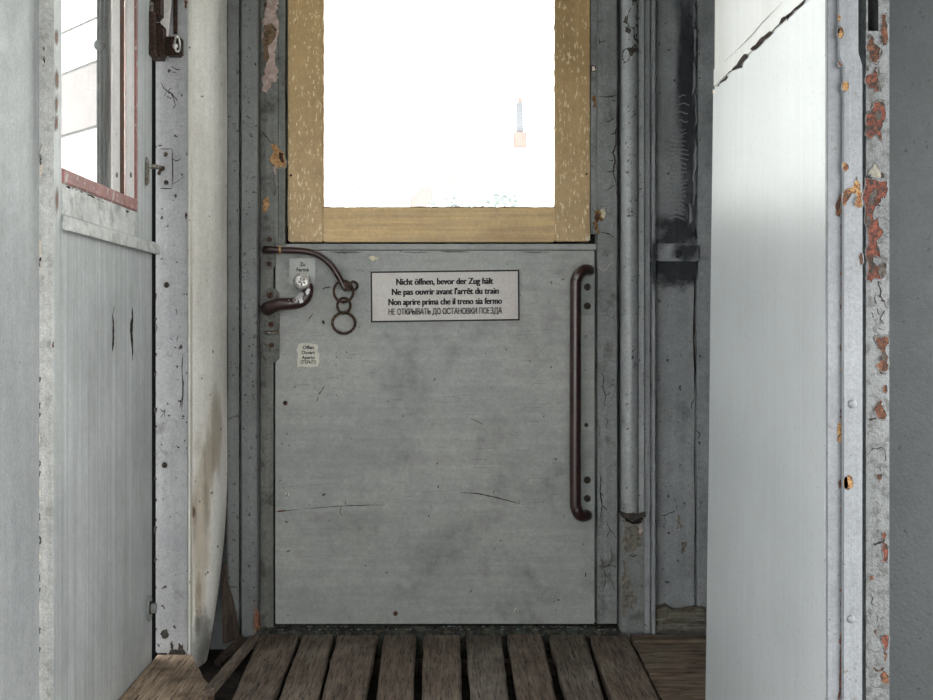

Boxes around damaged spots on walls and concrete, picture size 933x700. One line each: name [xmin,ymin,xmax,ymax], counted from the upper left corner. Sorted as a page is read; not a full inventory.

peeling [255,0,279,94]
corrosion [864,13,889,142]
peeling [269,142,287,174]
crack [598,95,637,216]
leakage [650,0,698,287]
corrosion [834,176,888,283]
crack [112,309,133,359]
corrosion [869,334,890,421]
corrosion [874,530,889,563]
corrosion [872,629,890,684]